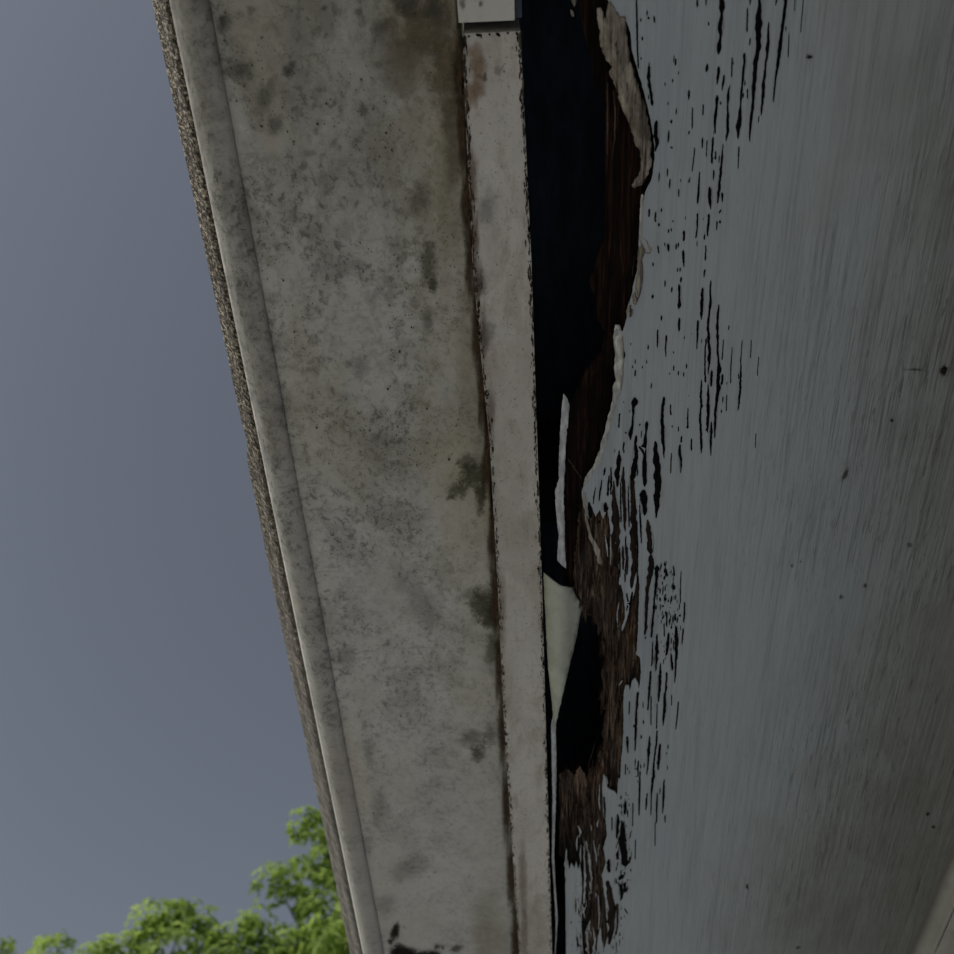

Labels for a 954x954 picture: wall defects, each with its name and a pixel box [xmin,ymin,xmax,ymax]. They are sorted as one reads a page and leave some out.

damp [401,0,486,104]
peeling [461,30,546,720]
peeling [586,0,804,950]